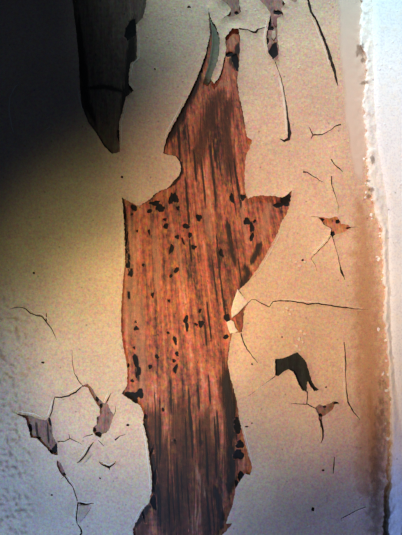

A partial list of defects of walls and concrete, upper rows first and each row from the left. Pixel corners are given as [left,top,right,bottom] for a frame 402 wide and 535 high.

peeling [260,0,285,64]
crack [307,0,338,85]
peeling [72,0,146,154]
crack [275,62,291,142]
peeling [121,12,292,535]
crack [249,299,368,310]
crack [46,357,87,416]
peeling [81,383,115,438]
peeling [273,330,327,391]
peeling [14,411,67,478]
crack [60,434,125,464]
crack [61,475,94,535]